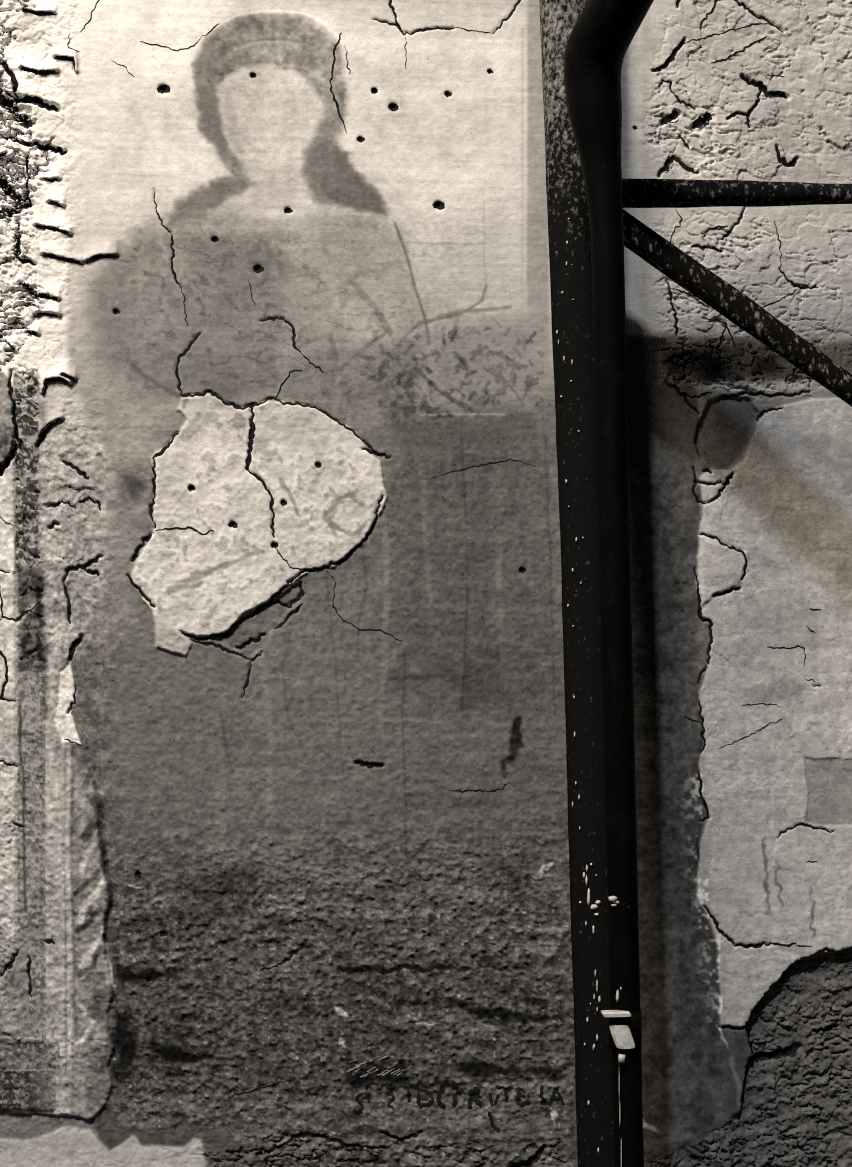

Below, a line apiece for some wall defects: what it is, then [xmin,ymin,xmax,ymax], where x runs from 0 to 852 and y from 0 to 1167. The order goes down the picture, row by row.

crack [0,62,66,265]
crack [373,0,521,68]
crack [670,208,745,252]
crack [653,0,787,177]
crack [0,371,23,476]
crack [47,460,101,529]
crack [127,432,214,607]
flaking render [131,394,389,658]
crack [153,189,401,698]
crack [63,556,102,745]
peeling [647,399,852,1167]
crack [704,906,837,1097]